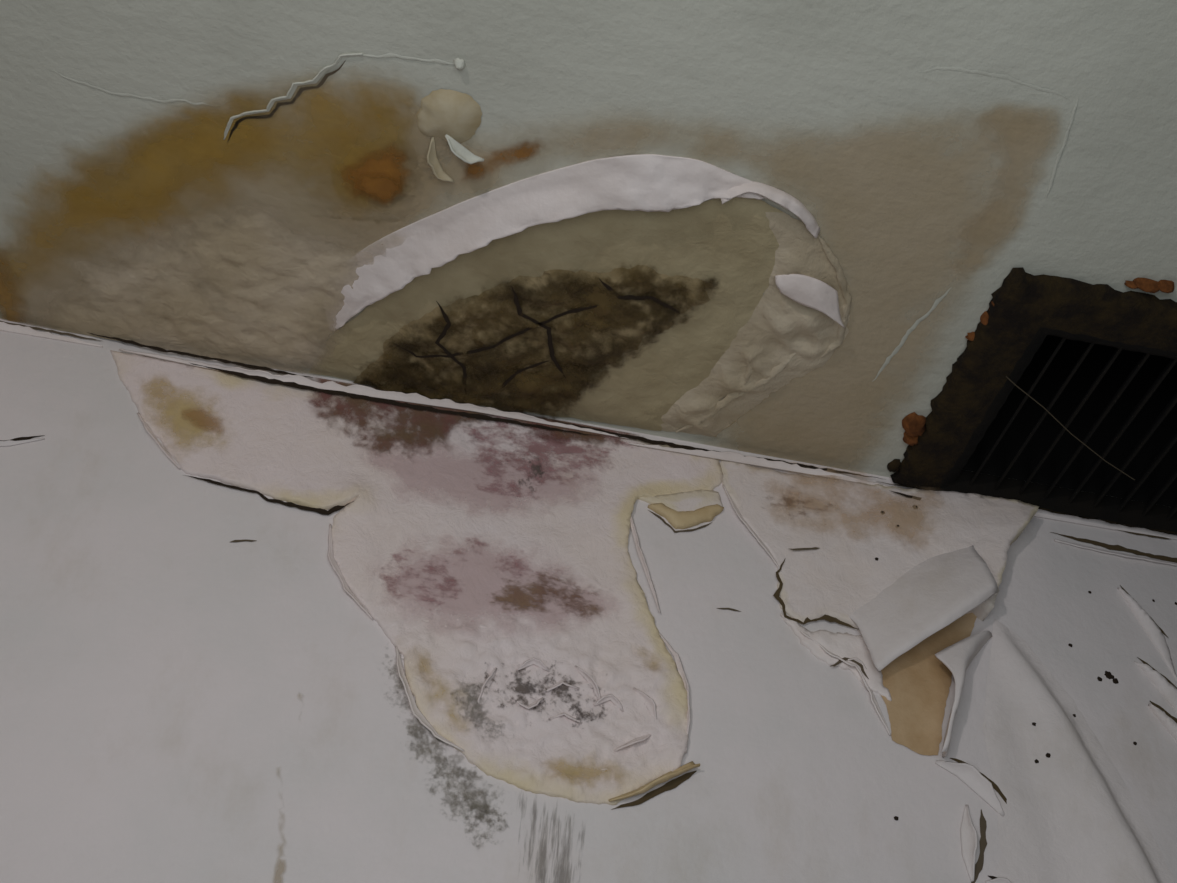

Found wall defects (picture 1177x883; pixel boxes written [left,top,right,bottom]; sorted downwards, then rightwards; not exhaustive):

corrosion [466,143,538,177]
damp [0,93,501,325]
damp [738,111,1050,483]
corrosion [1124,277,1175,293]
crack [0,321,926,490]
damp [312,378,635,504]
corrosion [887,459,901,473]
corrosion [902,412,926,446]
peeling [110,154,1039,883]
crack [1034,509,1177,566]
damp [386,542,599,620]
damp [500,665,603,721]